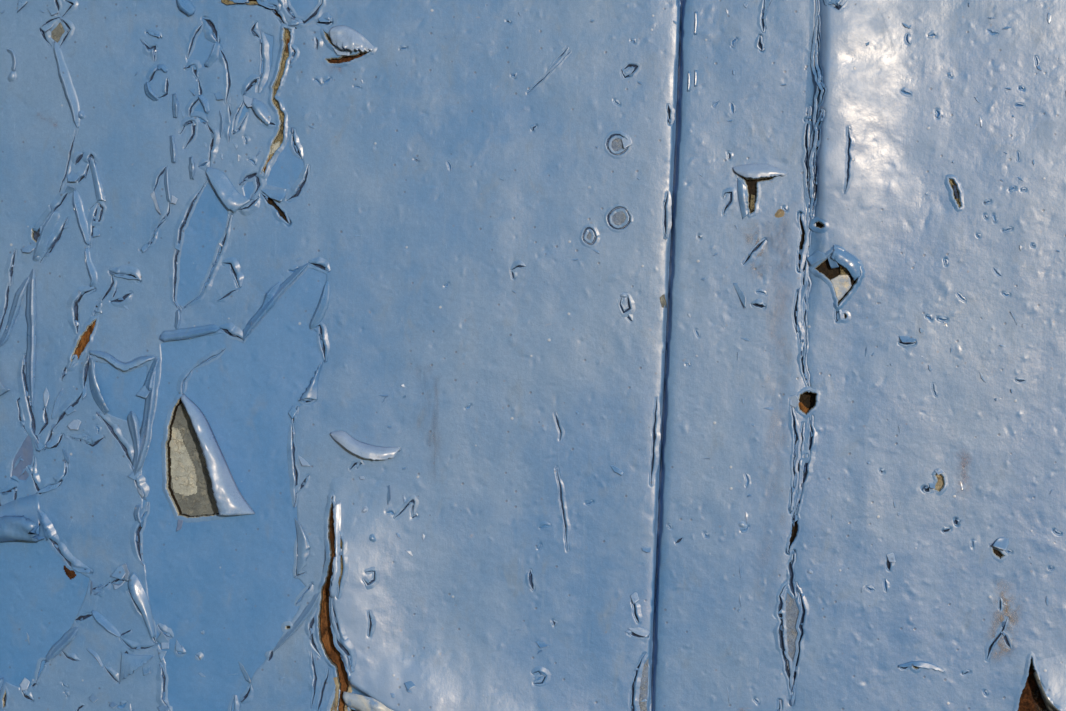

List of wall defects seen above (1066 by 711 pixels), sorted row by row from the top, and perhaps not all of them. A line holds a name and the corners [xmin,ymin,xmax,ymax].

peeling [314,12,377,85]
crack [221,0,303,179]
crack [170,93,210,180]
peeling [721,152,788,229]
peeling [944,160,965,212]
peeling [806,245,865,324]
rust [59,299,102,382]
peeling [0,0,330,711]
crack [773,0,855,711]
spalling [789,386,821,419]
peeling [327,681,416,711]
spalling [1012,651,1063,711]